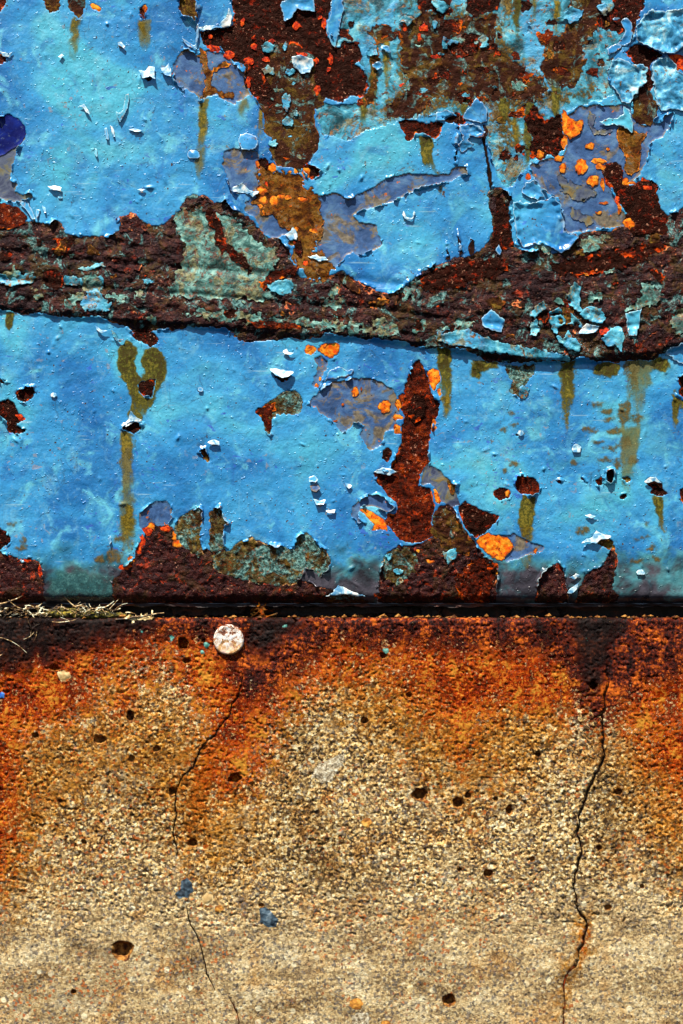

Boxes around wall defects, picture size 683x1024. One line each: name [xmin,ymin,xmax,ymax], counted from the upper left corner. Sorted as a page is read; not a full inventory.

peeling [0,114,46,222]
peeling [139,47,250,104]
peeling [222,146,289,238]
peeling [316,0,683,268]
rust [0,0,683,604]
peeling [270,369,294,382]
peeling [305,342,399,450]
peeling [582,514,612,544]
crack [172,674,243,855]
rust [0,617,683,901]
crack [562,675,609,1024]
crack [185,902,239,1024]